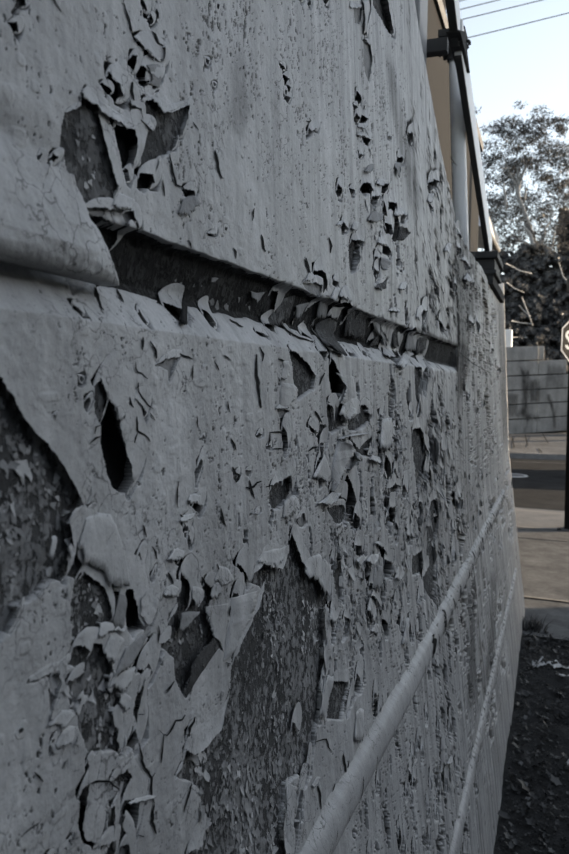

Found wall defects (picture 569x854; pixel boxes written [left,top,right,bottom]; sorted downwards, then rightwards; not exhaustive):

peeling [6,0,31,34]
peeling [37,0,201,251]
peeling [336,0,414,291]
peeling [427,170,440,210]
peeling [302,254,352,302]
peeling [444,220,474,295]
peeling [0,277,500,854]
crack [27,662,60,682]